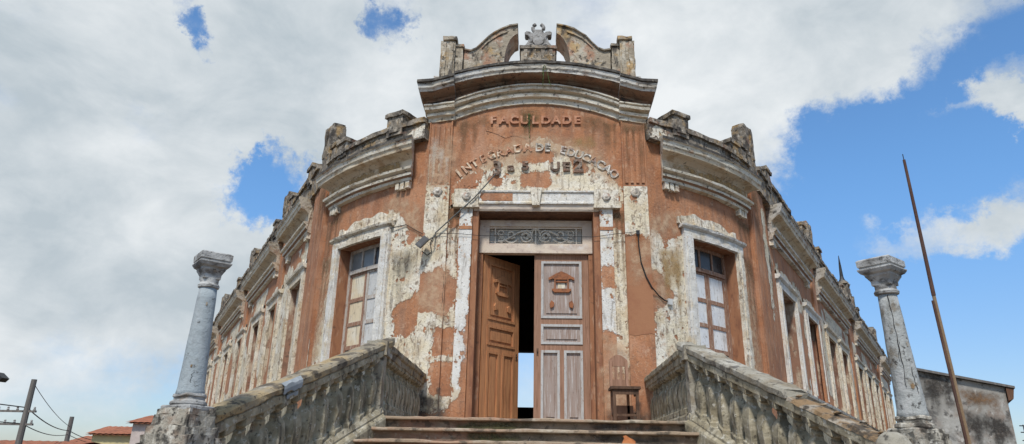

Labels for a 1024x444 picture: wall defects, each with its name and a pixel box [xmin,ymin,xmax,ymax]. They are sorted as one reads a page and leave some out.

peeling [383,136,689,414]
crack [887,295,919,392]
water stain [966,413,1010,444]